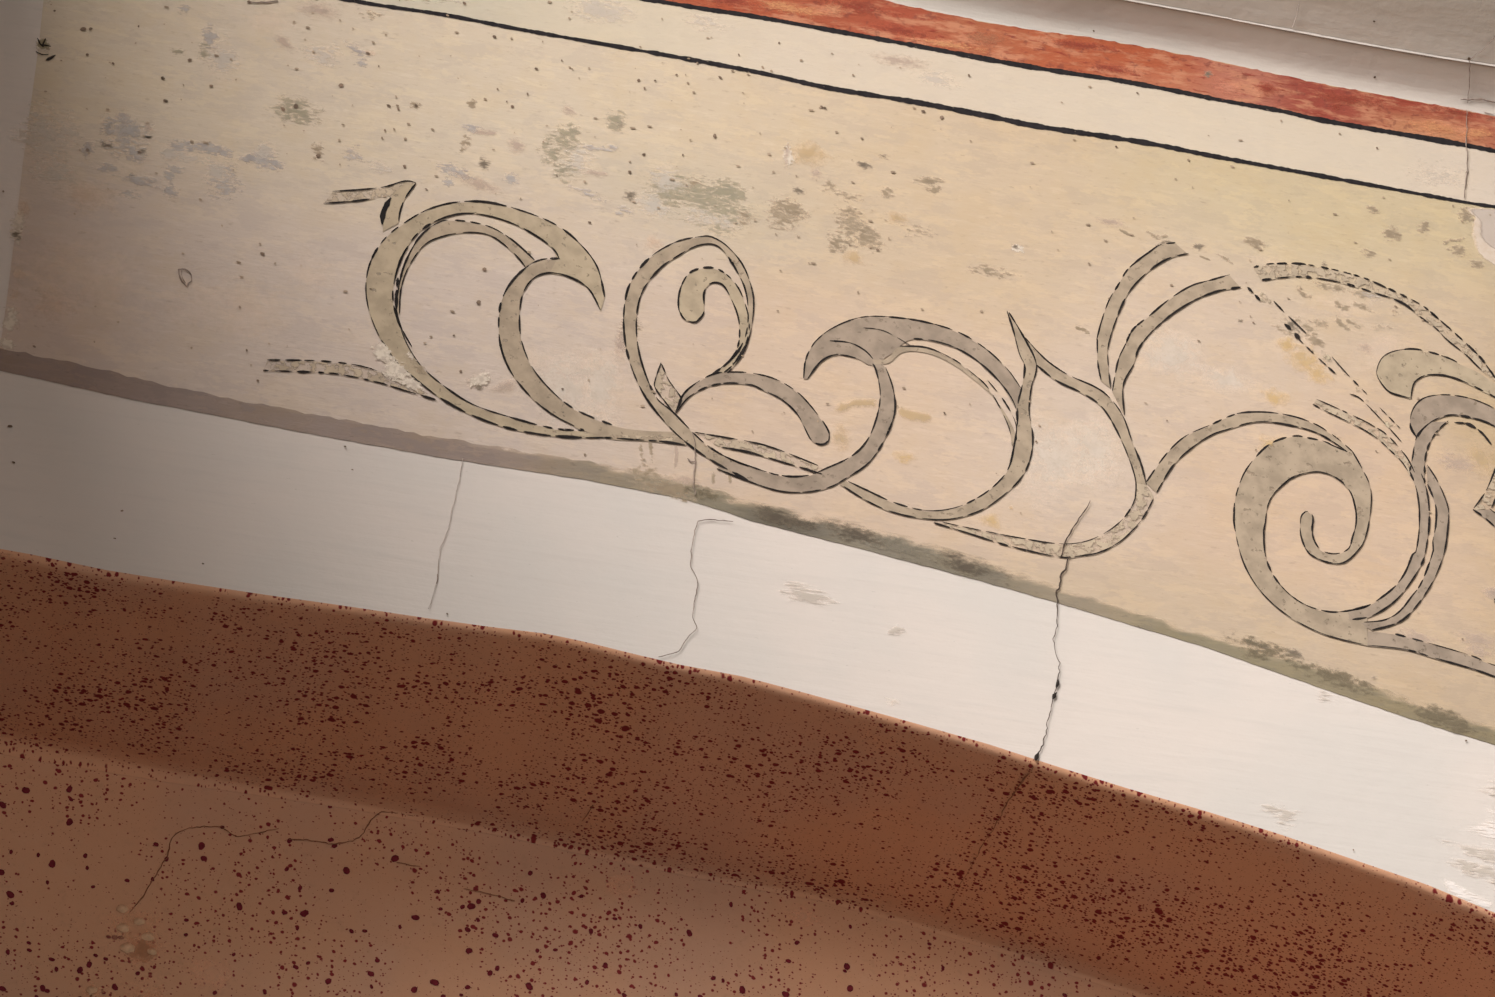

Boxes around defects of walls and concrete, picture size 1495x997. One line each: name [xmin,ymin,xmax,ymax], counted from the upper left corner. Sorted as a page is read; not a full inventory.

crack [1118,0,1495,198]
damp [542,109,625,201]
damp [616,168,807,233]
damp [799,147,881,261]
damp [915,177,944,193]
peeling [1468,208,1495,264]
crack [429,459,463,607]
crack [658,432,733,657]
damp [758,506,819,530]
crack [944,502,1090,915]
damp [1228,634,1376,694]
damp [1415,706,1475,732]